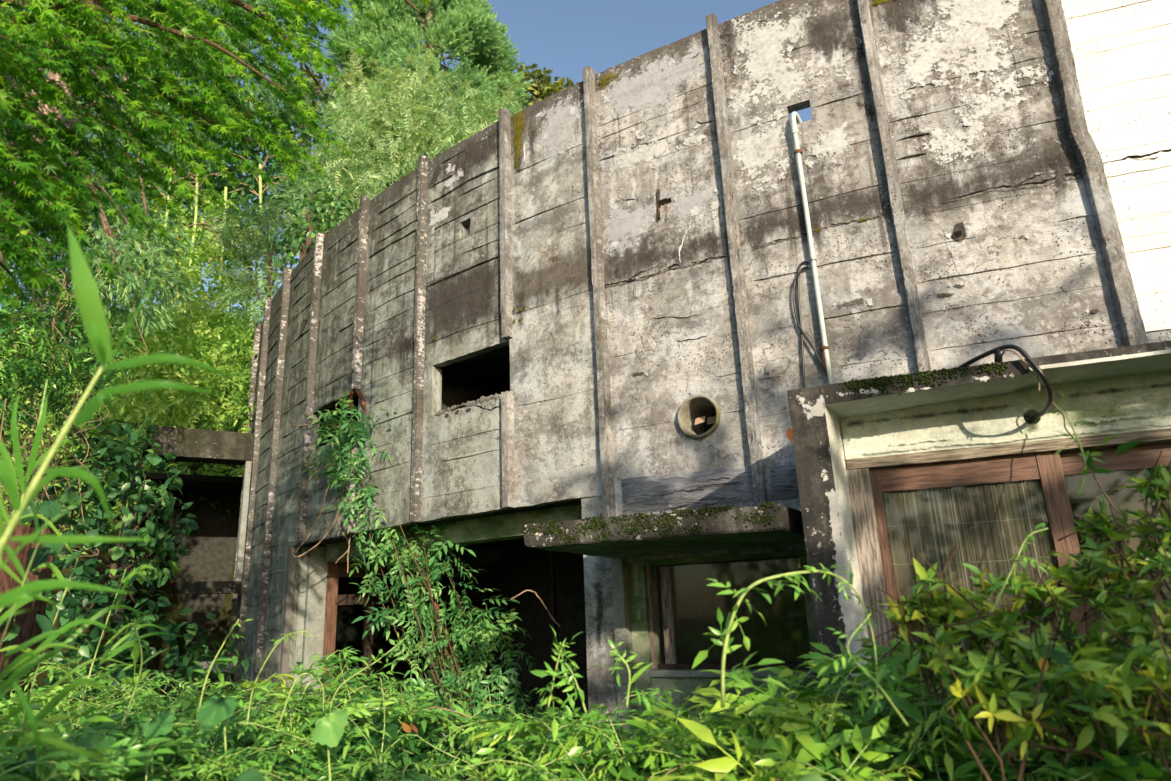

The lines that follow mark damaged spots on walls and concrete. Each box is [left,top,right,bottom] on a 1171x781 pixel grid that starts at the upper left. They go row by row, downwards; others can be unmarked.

water stain [883,0,938,31]
water stain [809,15,871,114]
water stain [516,121,535,168]
crack [942,149,1171,203]
water stain [613,219,727,277]
crack [604,211,889,287]
peeling [796,388,878,420]
peeling [821,469,864,698]